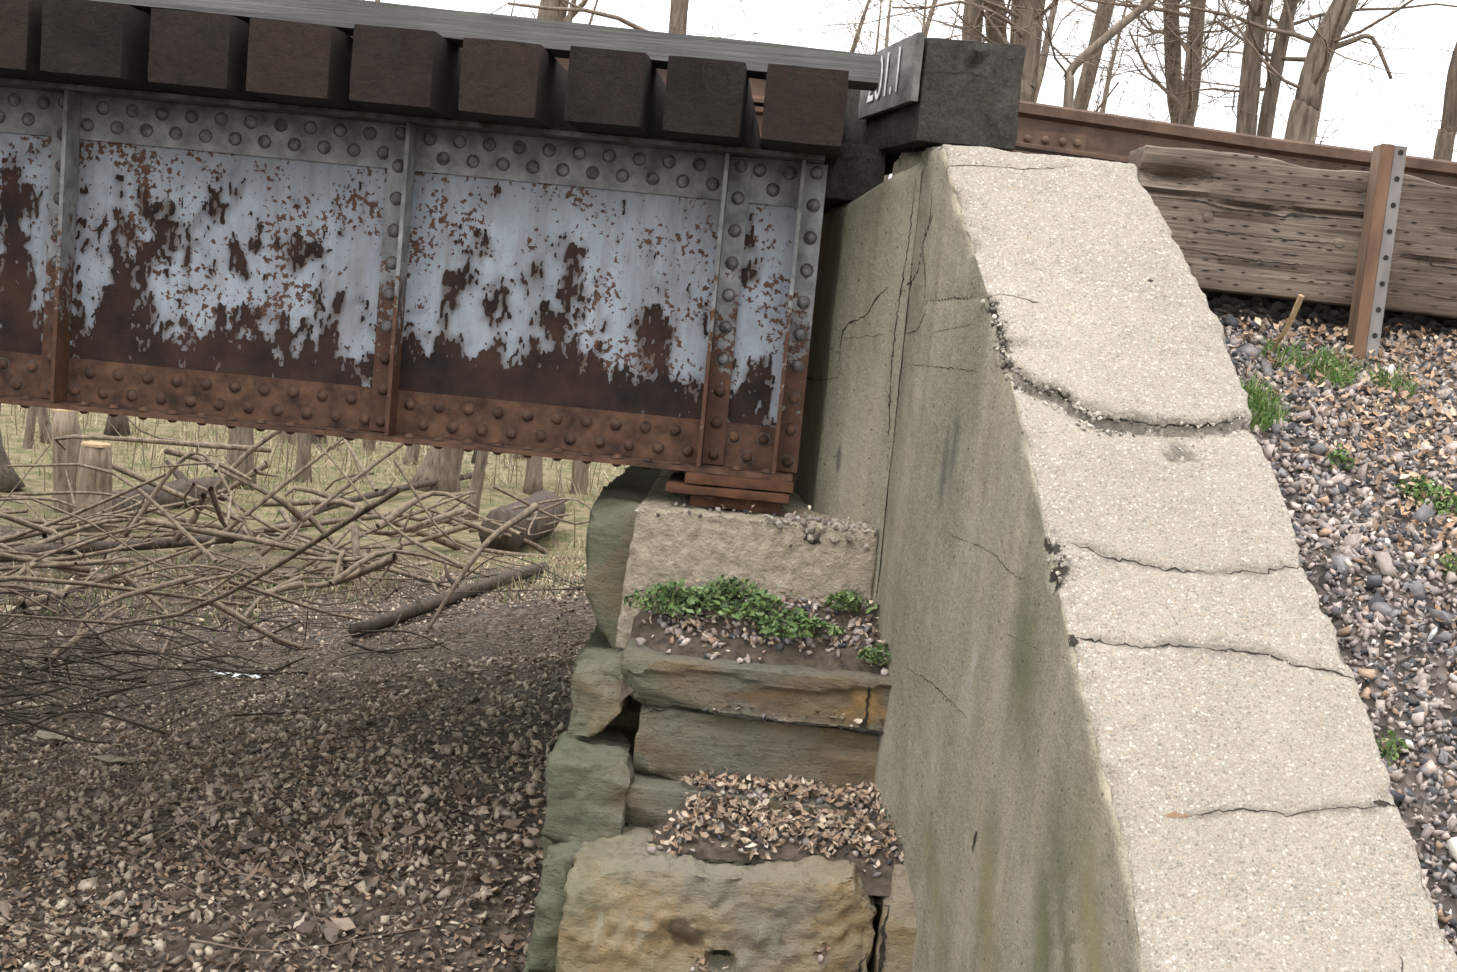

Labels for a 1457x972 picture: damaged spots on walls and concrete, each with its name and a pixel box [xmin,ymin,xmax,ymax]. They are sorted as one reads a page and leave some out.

peeling [69,170,378,387]
crack [806,159,1243,495]
spalling [980,294,1245,463]
crack [944,531,1026,579]
crack [1068,543,1302,574]
crack [1006,633,1353,679]
crack [1182,805,1380,818]